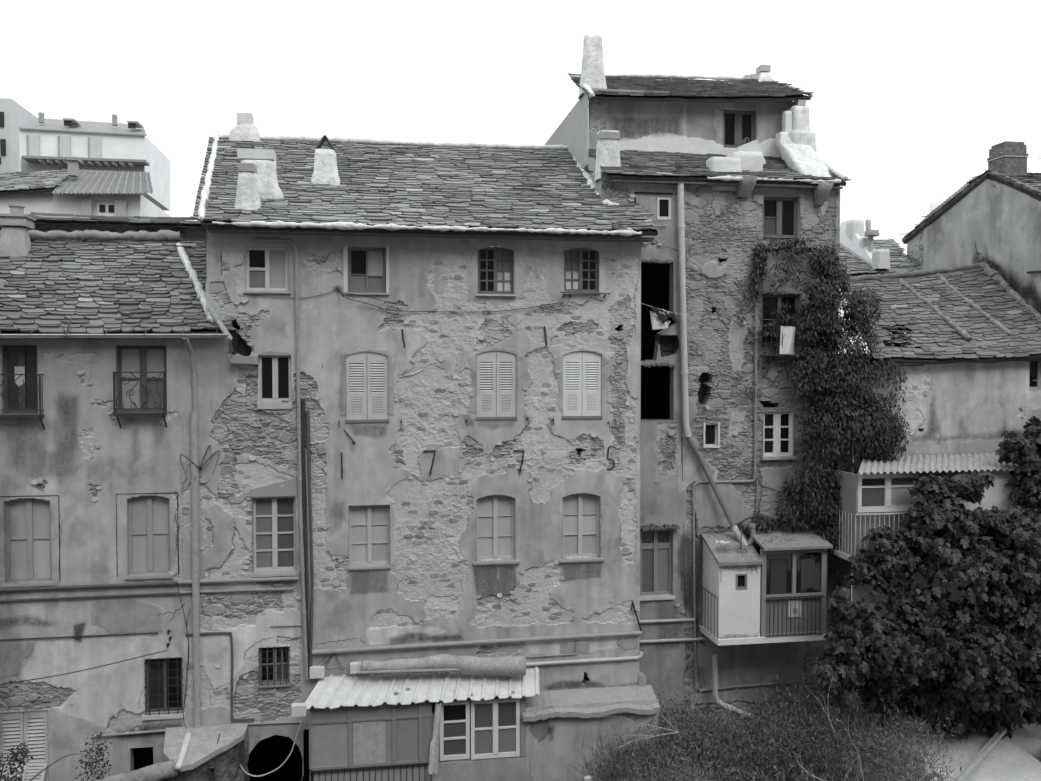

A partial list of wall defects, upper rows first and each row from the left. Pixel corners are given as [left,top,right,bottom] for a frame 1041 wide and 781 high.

flaking render [298,252,343,276]
flaking render [220,250,258,395]
flaking render [727,318,747,372]
flaking render [688,366,709,376]
flaking render [368,240,662,629]
flaking render [728,410,748,437]
flaking render [168,455,297,599]
flaking render [311,485,348,595]
flaking render [200,590,302,632]
flaking render [183,664,231,710]
flaking render [243,655,259,679]
flaking render [276,637,301,674]